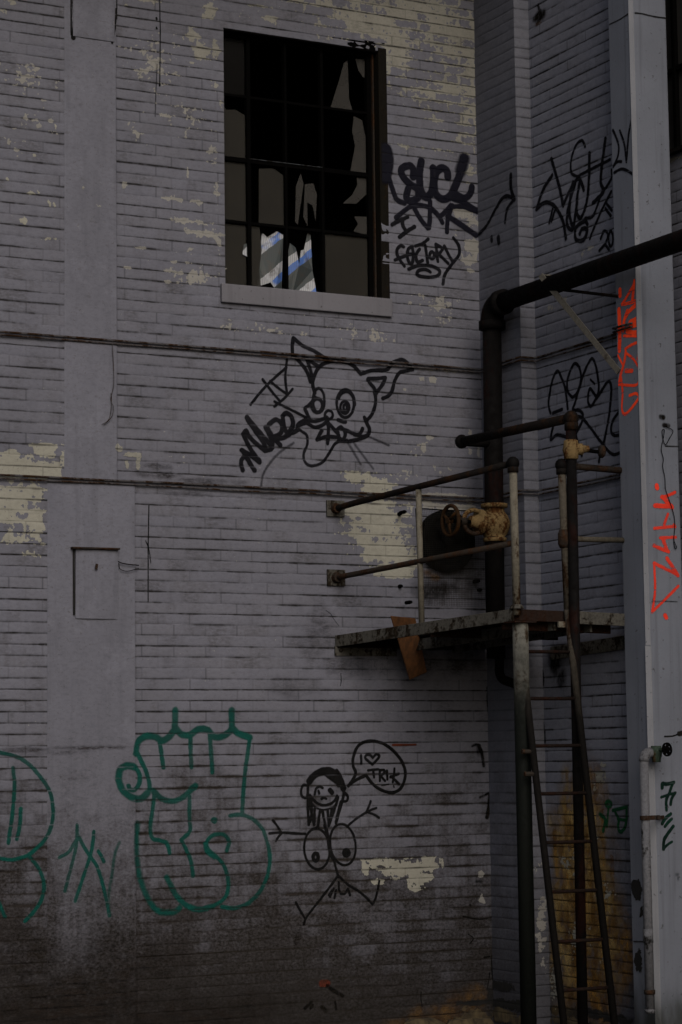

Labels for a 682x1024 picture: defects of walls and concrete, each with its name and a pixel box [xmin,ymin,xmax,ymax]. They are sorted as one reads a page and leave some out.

peeling [118,0,222,164]
peeling [163,216,227,293]
peeling [0,440,64,558]
peeling [334,470,477,579]
peeling [360,856,444,892]
rust [553,773,633,1024]